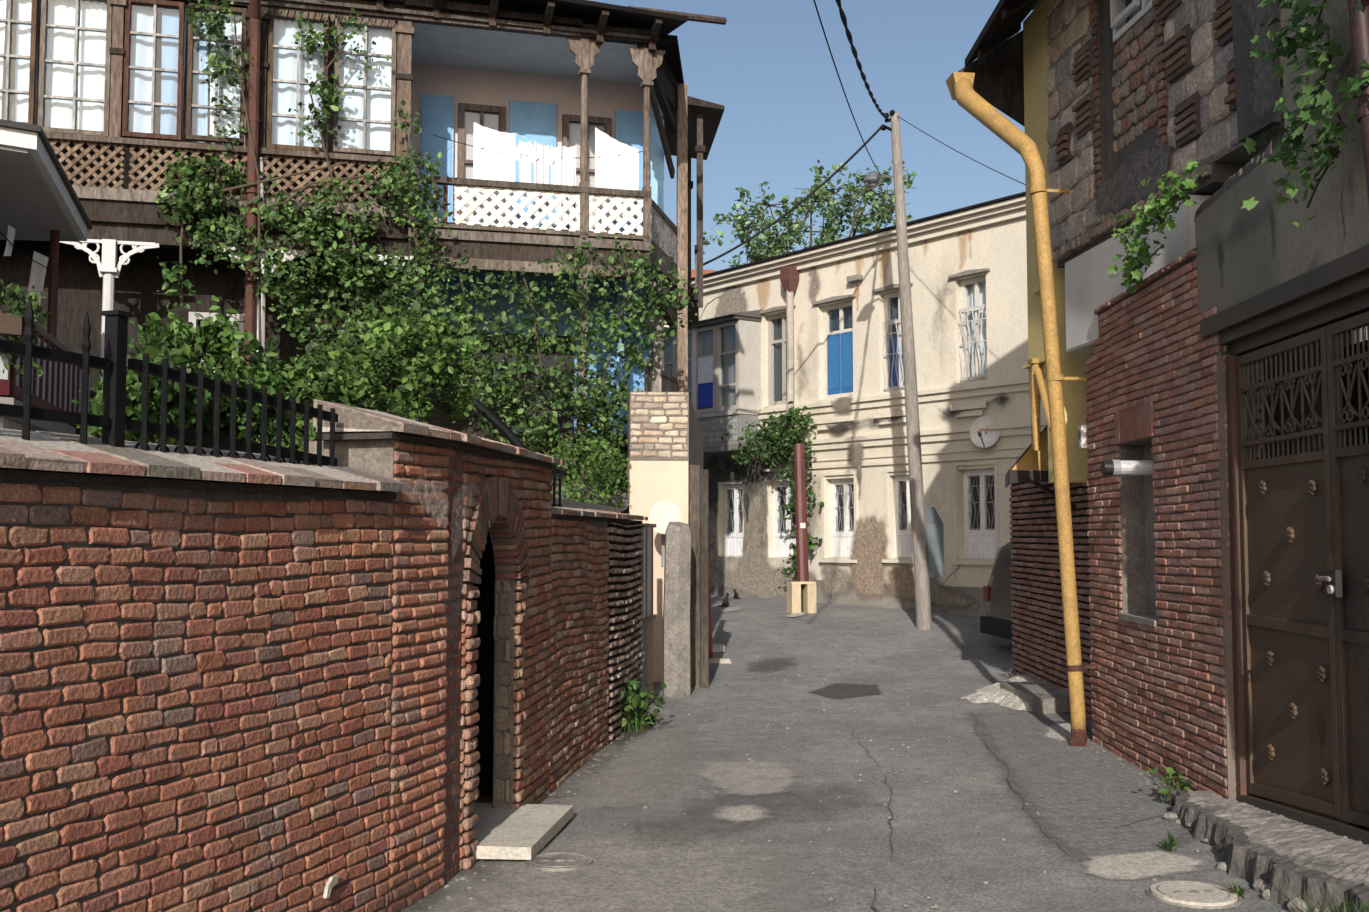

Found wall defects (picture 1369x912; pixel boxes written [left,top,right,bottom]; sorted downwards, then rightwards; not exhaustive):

damp [703,454,775,565]
flaking render [709,516,978,610]
crack [814,730,893,912]